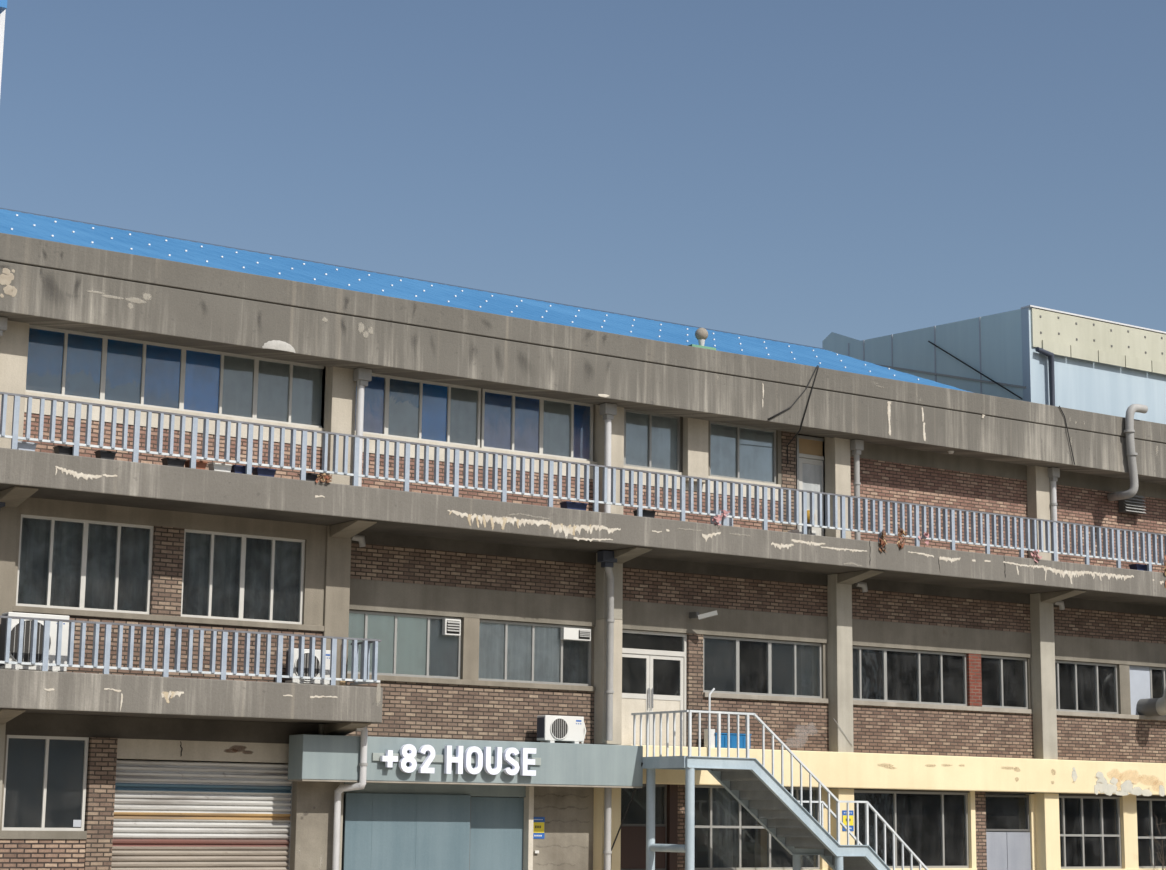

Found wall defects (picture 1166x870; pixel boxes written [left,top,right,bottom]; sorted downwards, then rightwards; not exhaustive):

spalling [0,268,17,298]
peeling [1094,771,1165,796]